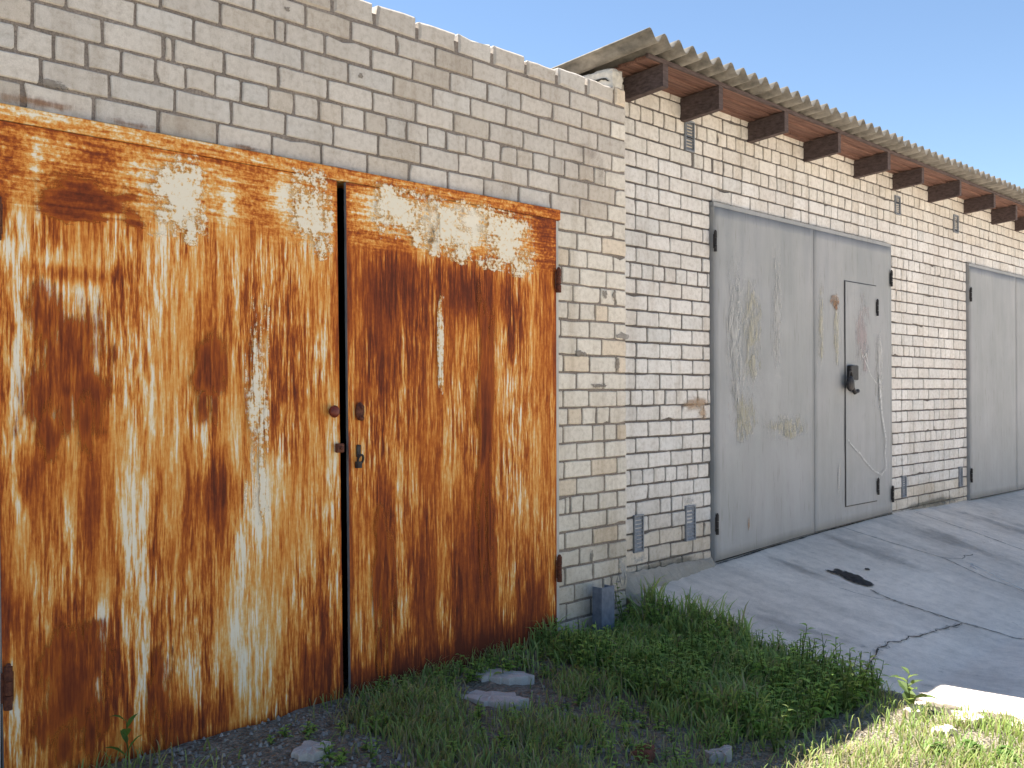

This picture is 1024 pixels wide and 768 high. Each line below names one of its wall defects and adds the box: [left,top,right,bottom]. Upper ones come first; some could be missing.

rust [35,171,145,229]
peeling [148,154,208,246]
peeling [291,167,334,261]
peeling [373,182,536,278]
rust [14,274,117,464]
rust [190,328,228,425]
peeling [244,300,270,524]
rust [475,283,496,584]
rust [372,503,398,677]
crack [841,588,1024,670]
rust [32,618,116,768]
rust [147,641,175,753]